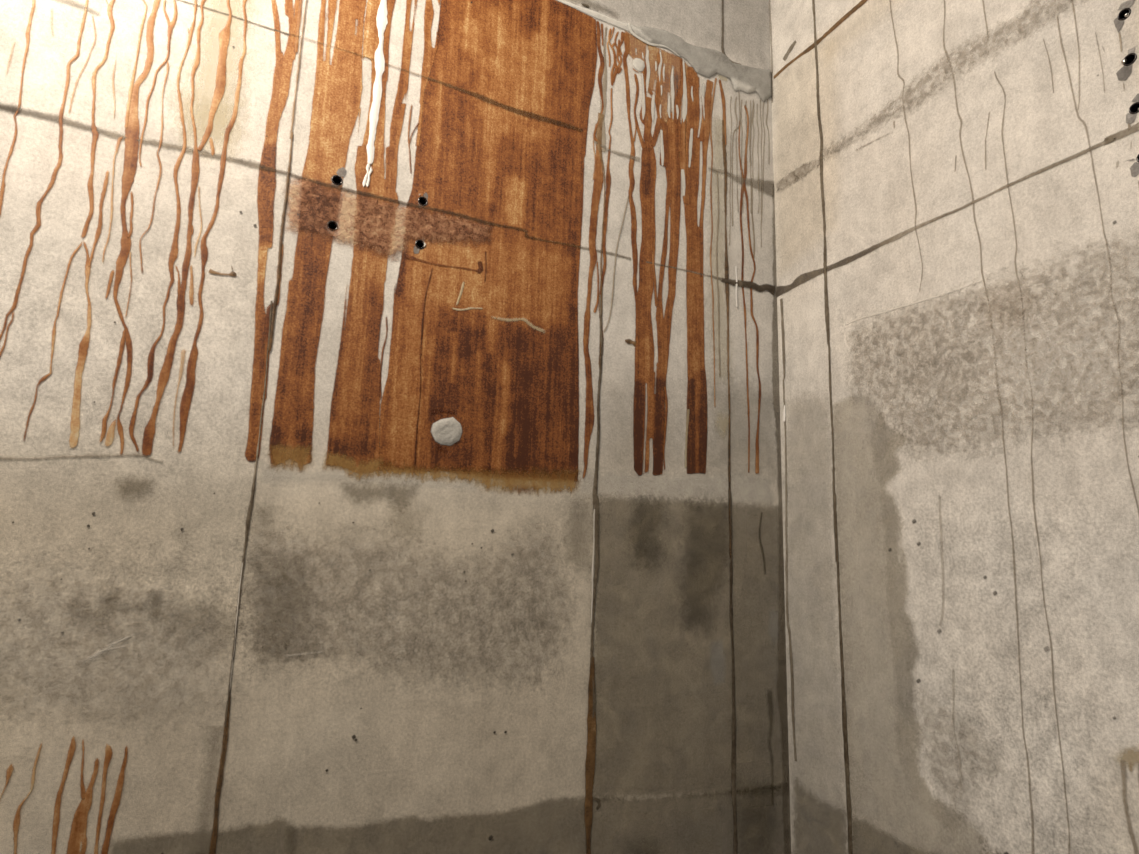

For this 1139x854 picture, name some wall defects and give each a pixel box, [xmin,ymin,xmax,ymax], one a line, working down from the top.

corrosion [0,0,247,456]
corrosion [245,0,336,471]
corrosion [302,0,713,493]
peeling [557,0,629,31]
leakage [890,0,923,291]
corrosion [13,743,42,854]
corrosion [51,736,128,854]